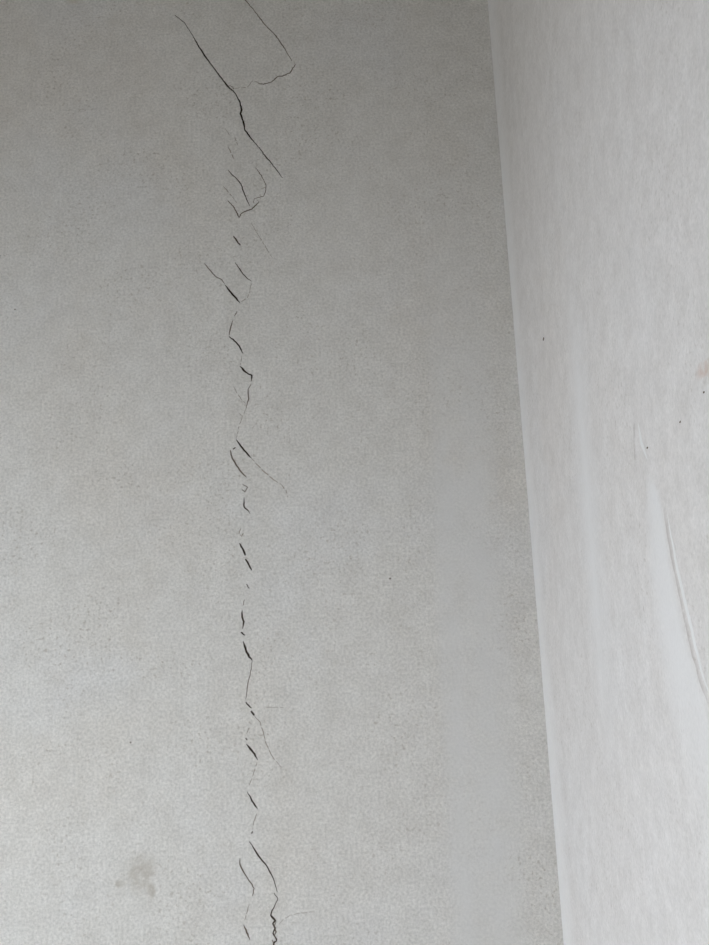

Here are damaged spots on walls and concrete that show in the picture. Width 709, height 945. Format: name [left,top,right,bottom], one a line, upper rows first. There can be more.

crack [175,0,296,945]